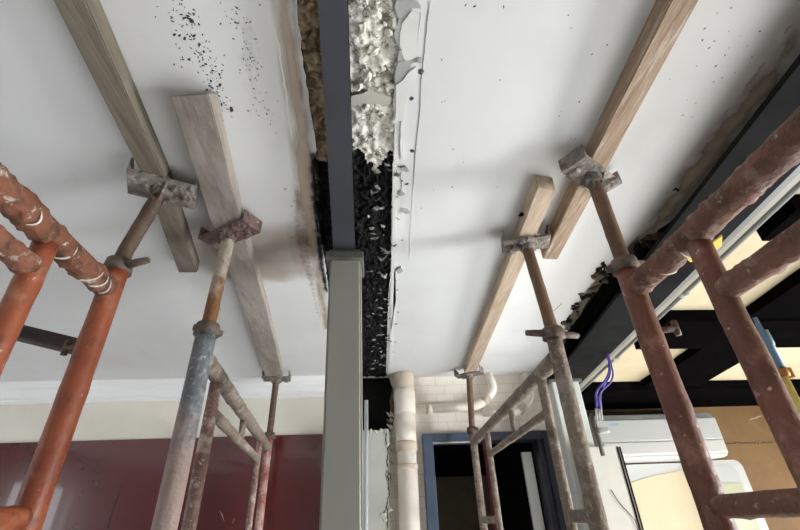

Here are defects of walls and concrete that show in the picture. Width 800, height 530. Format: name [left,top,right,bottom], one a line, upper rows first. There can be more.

water stain [169,0,233,121]
water stain [220,3,271,125]
spalling [348,0,424,375]
flaking render [561,261,613,329]
flaking render [633,231,662,260]
water stain [627,62,776,254]